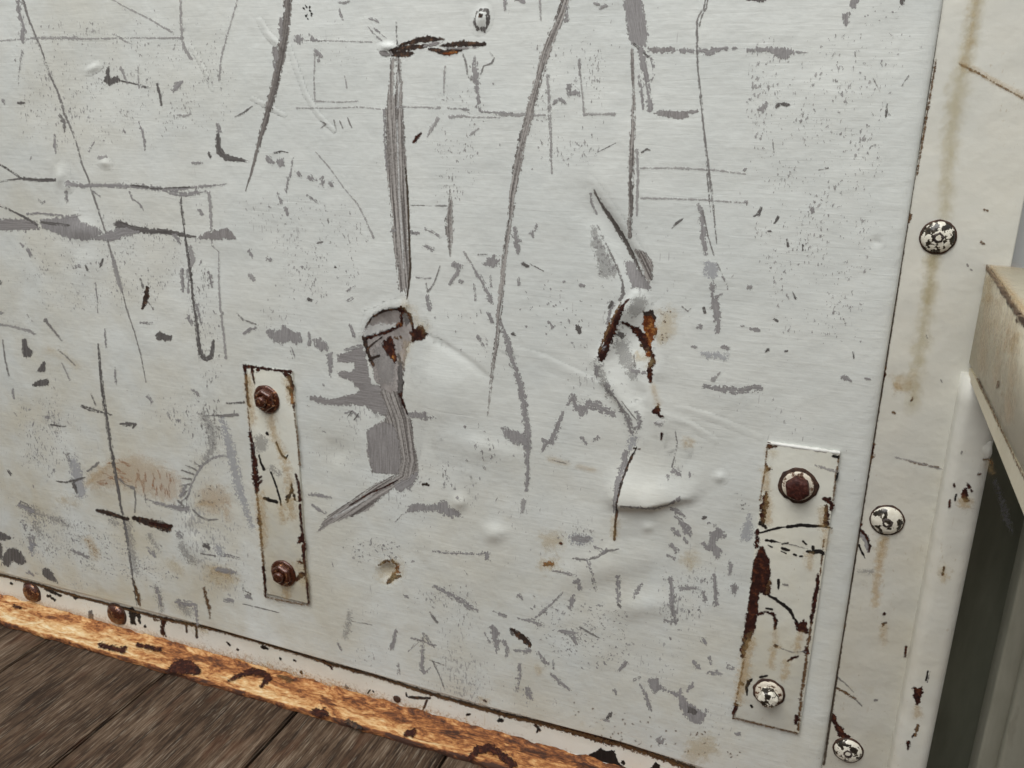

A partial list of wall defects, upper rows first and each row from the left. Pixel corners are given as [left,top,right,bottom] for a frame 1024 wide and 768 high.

peeling [17,212,227,389]
corrosion [362,306,414,367]
peeling [544,280,586,348]
corrosion [597,299,671,383]
peeling [691,345,729,360]
peeling [541,393,616,452]
peeling [263,483,296,504]
corrosion [378,559,401,584]
corrosion [732,442,825,734]
corrosion [0,574,696,768]